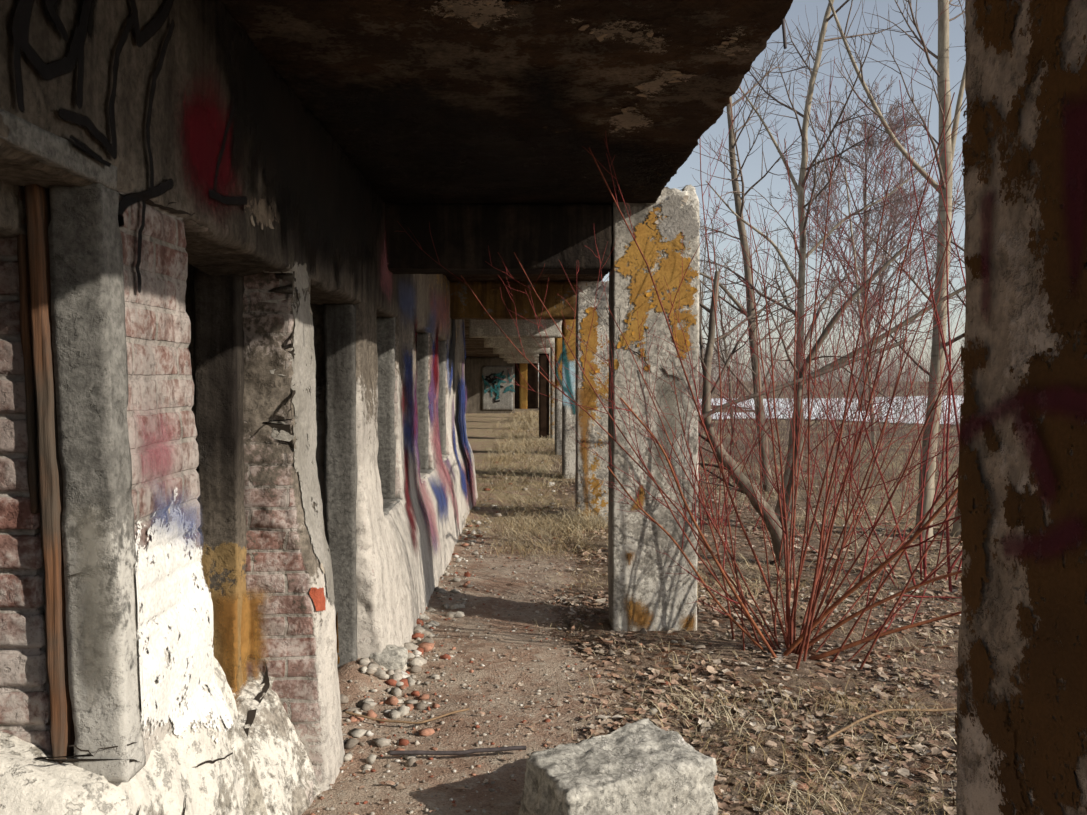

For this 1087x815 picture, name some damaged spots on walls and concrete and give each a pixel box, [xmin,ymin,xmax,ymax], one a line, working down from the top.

peeling [420,0,519,33]
peeling [565,17,698,137]
peeling [564,281,609,410]
peeling [614,193,699,372]
peeling [955,0,1087,815]
crack [195,659,270,767]